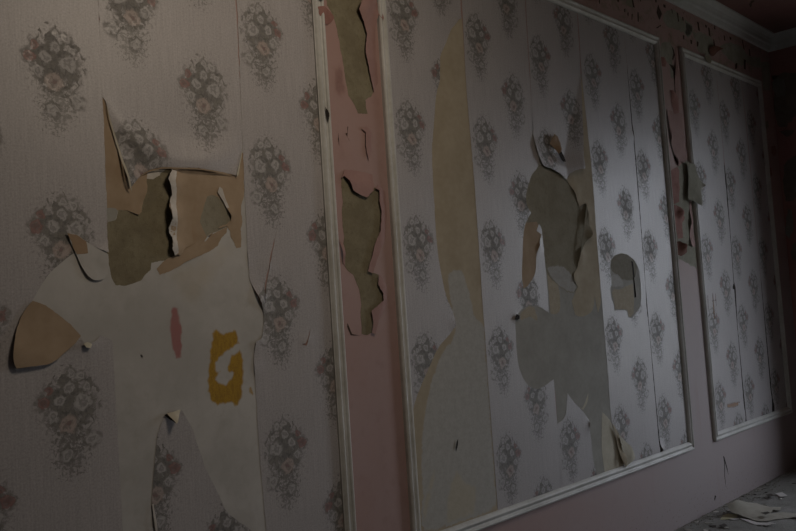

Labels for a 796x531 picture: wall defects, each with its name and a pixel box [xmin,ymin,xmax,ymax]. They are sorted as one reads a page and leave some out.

peeling [318,0,384,114]
peeling [660,42,706,269]
flaking render [107,169,175,286]
flaking render [200,195,232,236]
peeling [339,170,387,336]
flaking render [526,165,589,293]
flaking render [610,253,638,282]